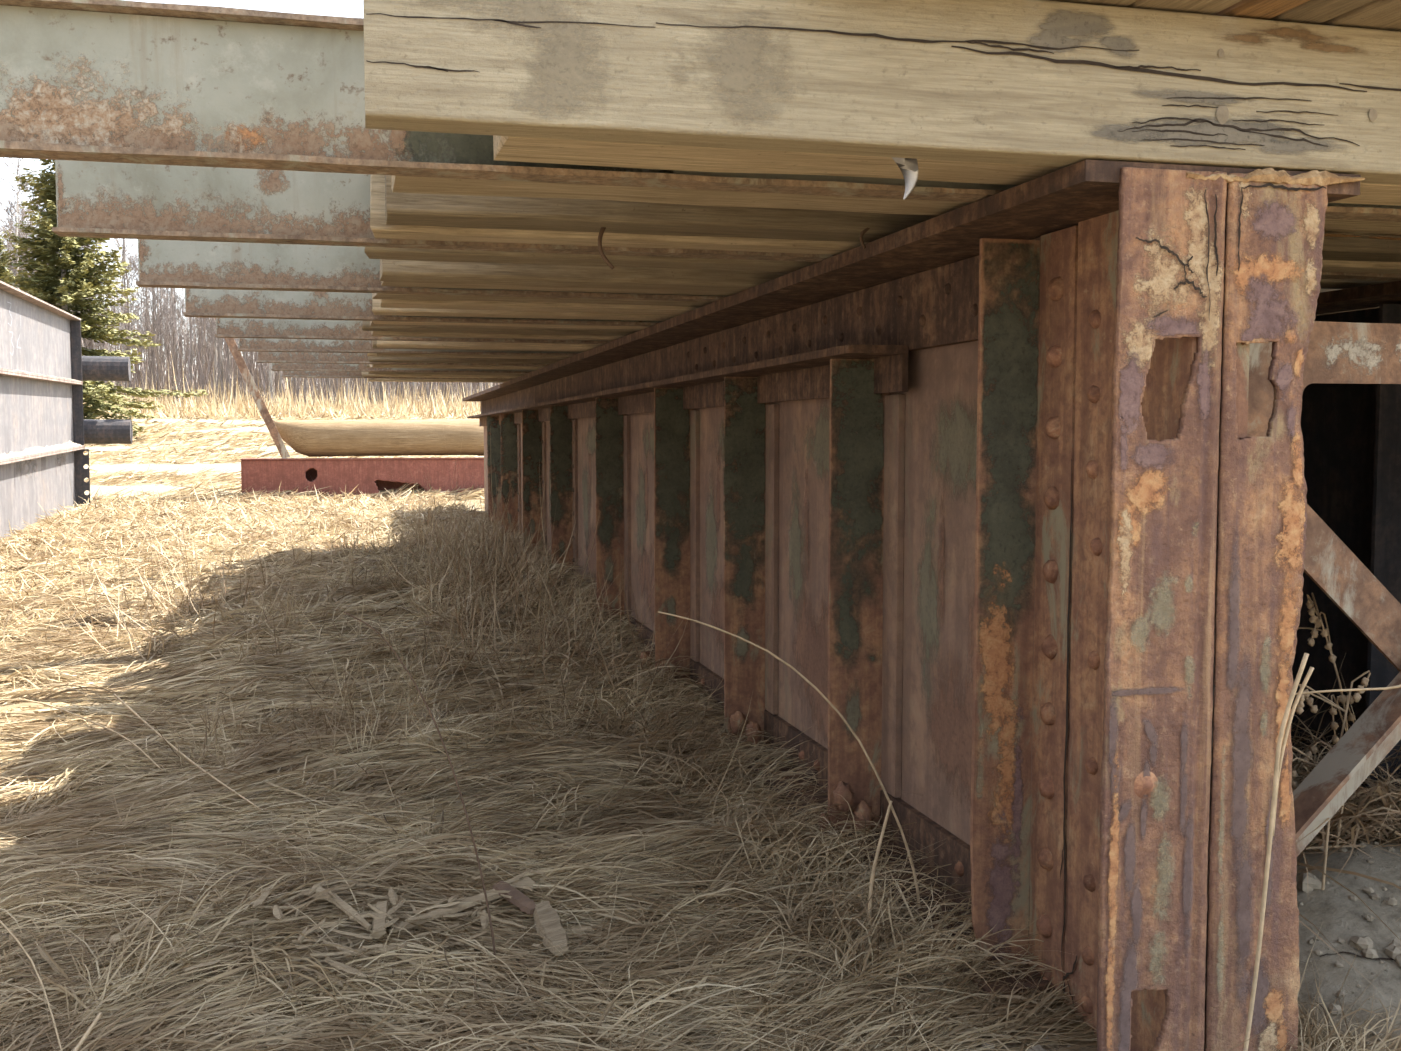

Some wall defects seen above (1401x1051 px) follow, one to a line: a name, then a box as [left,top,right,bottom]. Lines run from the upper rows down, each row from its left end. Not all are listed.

crack [366,13,1401,150]
rust [57,113,414,337]
rust [1123,182,1320,376]
crack [1136,183,1326,321]
rust [795,500,828,740]
rust [1117,467,1170,595]
rust [1275,432,1306,823]
rust [979,601,1023,961]